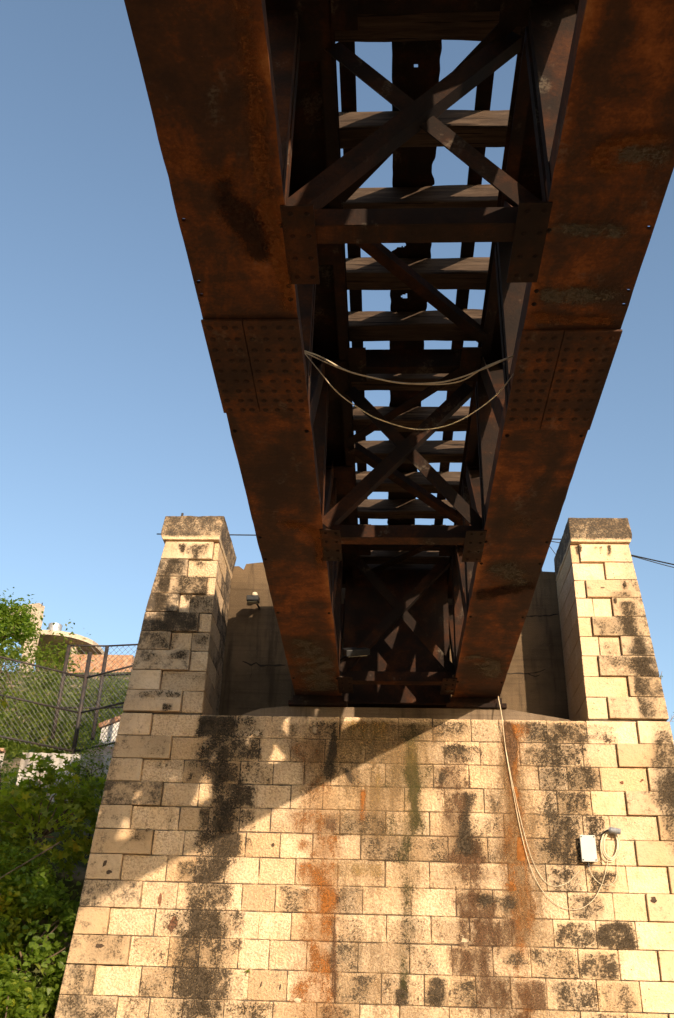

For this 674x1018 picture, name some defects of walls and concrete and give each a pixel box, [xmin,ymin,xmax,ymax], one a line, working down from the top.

corrosion [217,180,271,262]
water stain [179,543,209,567]
water stain [123,715,274,1018]
corrosion [290,770,339,1018]
water stain [291,720,601,1018]
water stain [647,731,674,845]